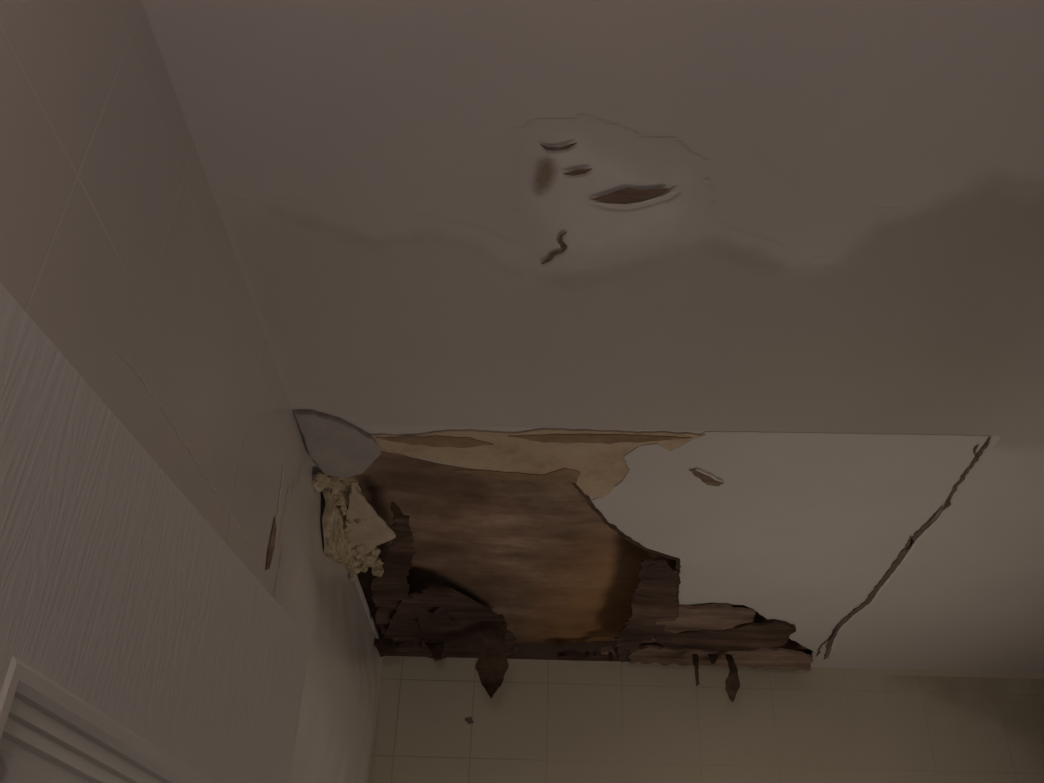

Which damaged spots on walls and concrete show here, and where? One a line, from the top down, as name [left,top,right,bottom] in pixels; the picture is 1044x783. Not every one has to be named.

water stain [223,167,1044,463]
spalling [294,411,396,581]
spalling [507,641,630,662]
crack [817,437,991,660]